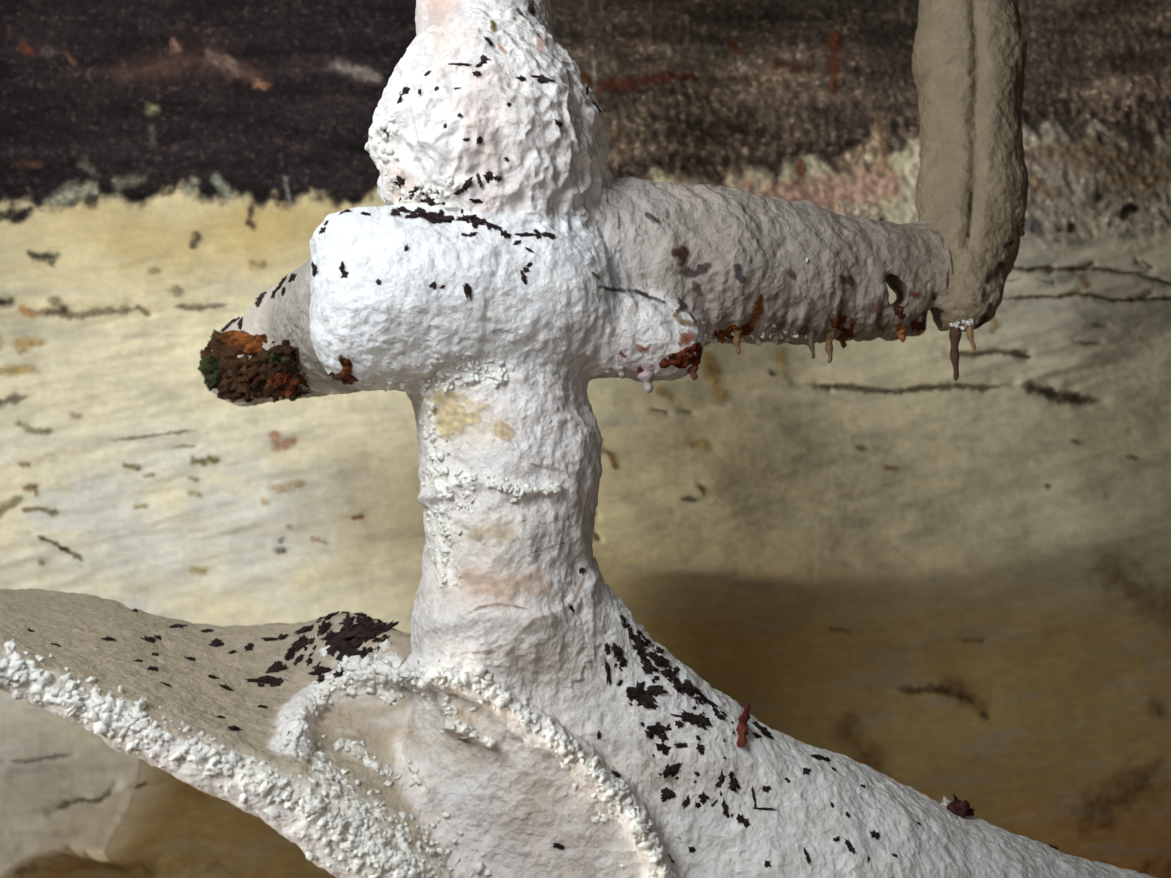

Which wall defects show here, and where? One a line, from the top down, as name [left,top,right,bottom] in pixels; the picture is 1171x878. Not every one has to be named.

corrosion [197,329,311,403]
corrosion [329,355,359,385]
corrosion [659,294,763,374]
corrosion [775,270,814,335]
corrosion [830,274,855,340]
corrosion [873,296,926,340]